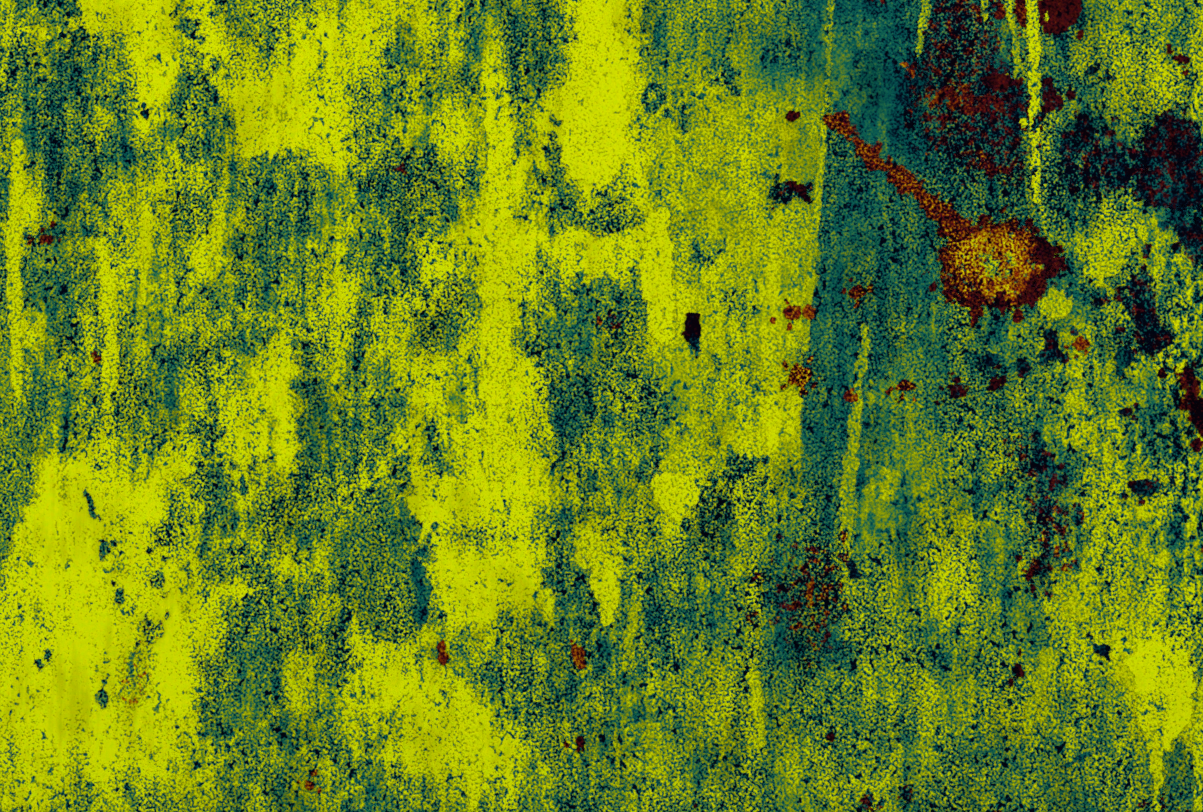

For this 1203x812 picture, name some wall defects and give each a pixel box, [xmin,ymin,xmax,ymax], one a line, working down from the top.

corrosion [900,0,1084,188]
corrosion [822,108,1068,328]
corrosion [1064,336,1090,359]